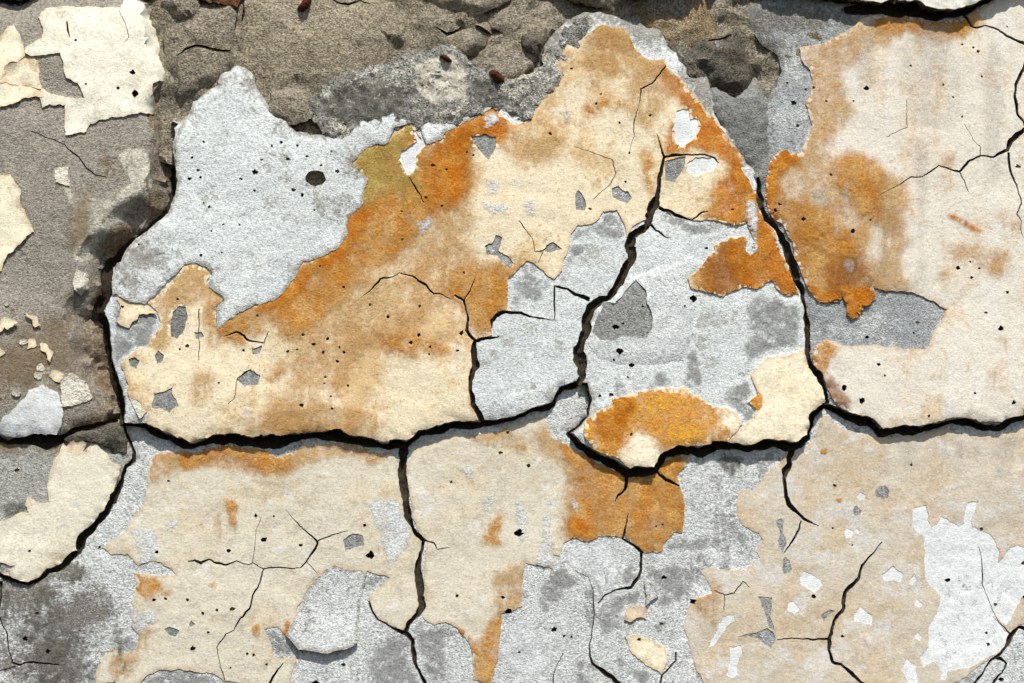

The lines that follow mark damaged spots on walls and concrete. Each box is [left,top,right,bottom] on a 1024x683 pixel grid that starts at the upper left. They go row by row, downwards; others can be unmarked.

peeling [0,174,34,271]
peeling [0,303,128,455]
crack [0,167,579,683]
corrosion [149,108,564,481]
spalling [144,0,822,197]
corrosion [539,389,730,553]
corrosion [585,12,980,320]
crack [566,135,1024,525]
crack [844,0,1024,215]
corrosion [460,566,520,683]
crack [779,543,881,683]
peeling [882,501,1024,683]